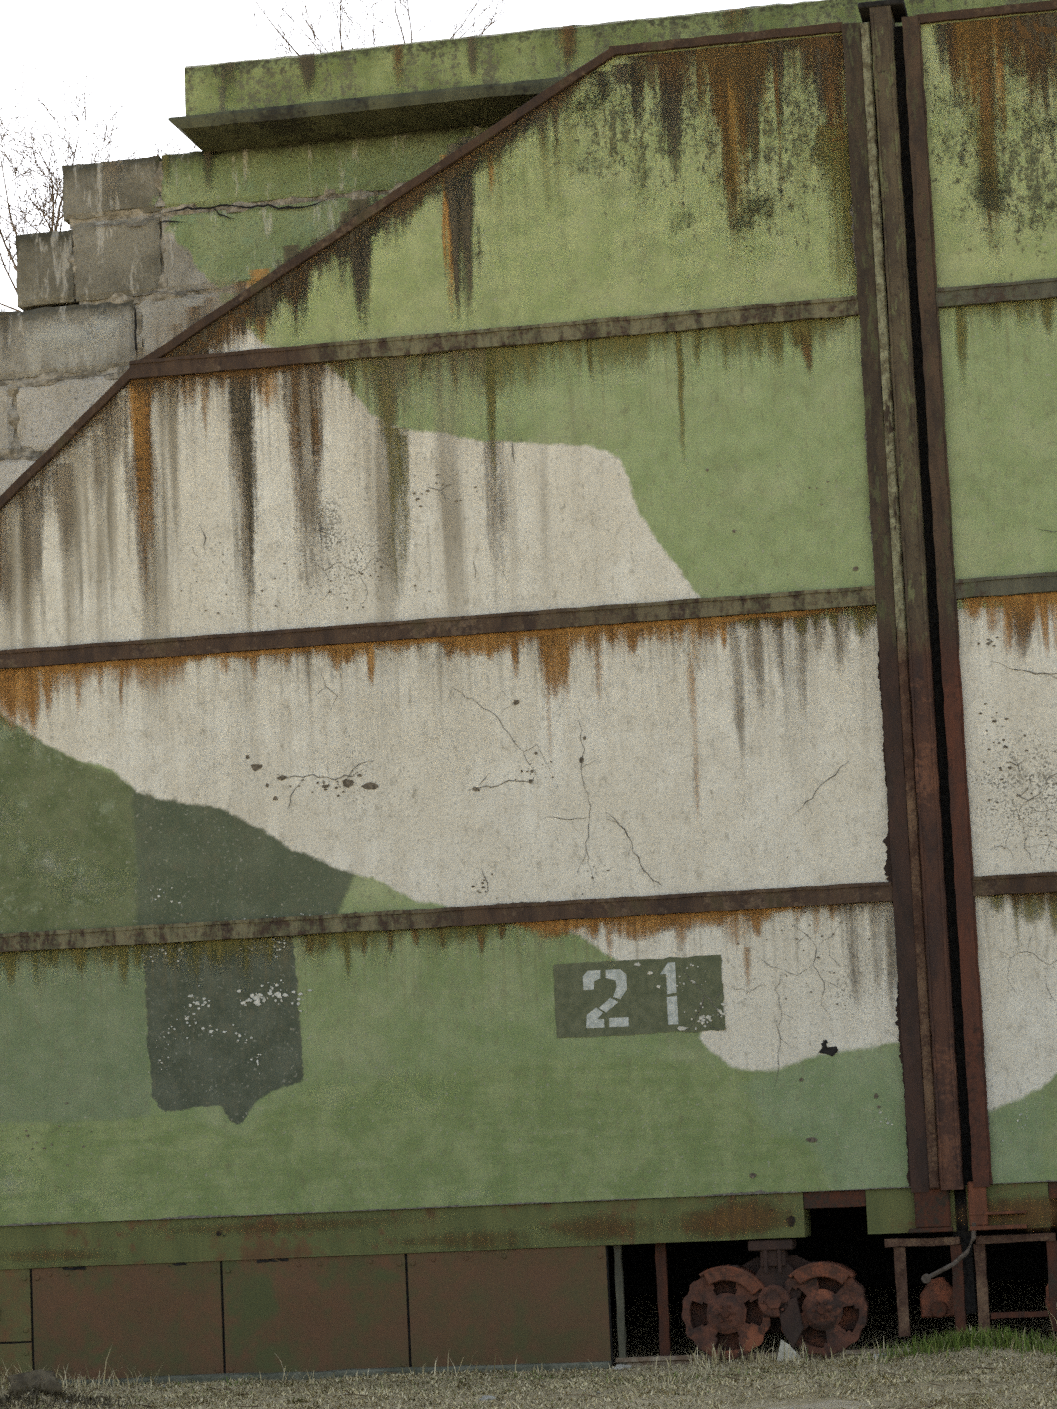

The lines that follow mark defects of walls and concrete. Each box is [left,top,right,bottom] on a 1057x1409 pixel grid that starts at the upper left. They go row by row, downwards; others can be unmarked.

corrosion [697,43,762,205]
corrosion [948,13,1057,220]
corrosion [95,361,345,569]
corrosion [0,605,877,726]
crack [992,661,1057,678]
spalling [246,755,378,800]
crack [278,761,369,813]
crack [452,687,661,888]
spalling [883,813,893,882]
spalling [979,703,1053,849]
crack [994,758,1057,863]
spalling [695,983,911,1227]